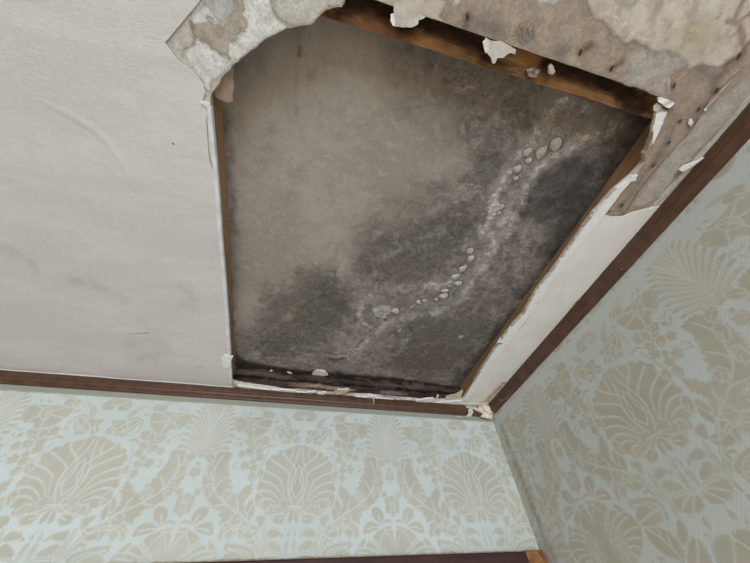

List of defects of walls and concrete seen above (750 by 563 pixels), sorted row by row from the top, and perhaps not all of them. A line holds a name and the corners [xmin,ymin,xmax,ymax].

peeling [390,0,425,27]
peeling [167,0,286,91]
peeling [482,37,516,64]
peeling [526,64,555,78]
spalling [650,97,674,145]
peeling [678,157,705,172]
damp [234,0,750,395]
peeling [413,174,659,405]